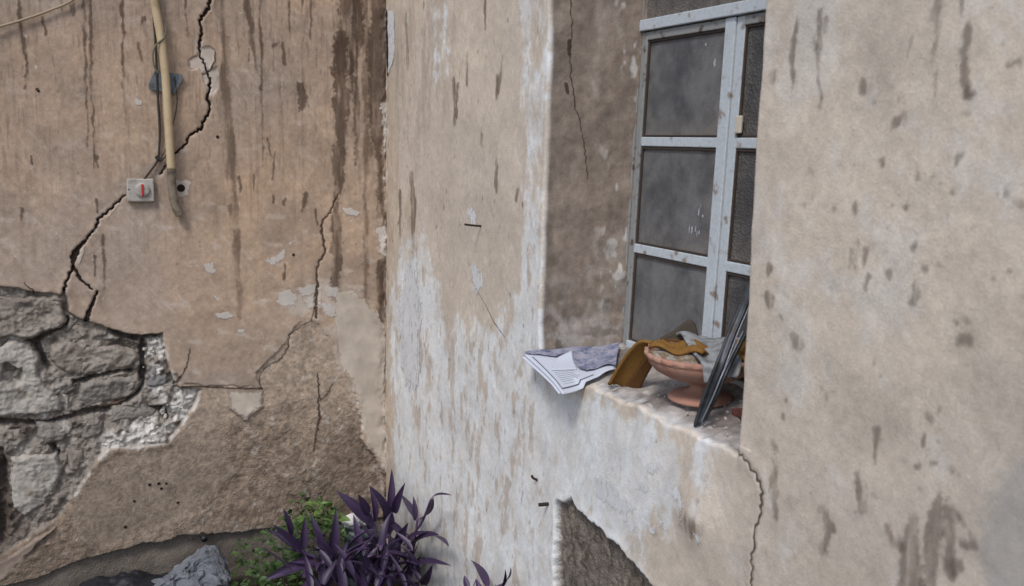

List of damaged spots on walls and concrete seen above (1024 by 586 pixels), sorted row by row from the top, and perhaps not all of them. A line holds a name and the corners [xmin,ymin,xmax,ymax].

water stain [73,0,94,124]
crack [159,0,220,174]
water stain [330,0,387,207]
crack [564,0,588,176]
crack [63,195,126,322]
crack [172,194,338,390]
peeling [266,241,295,265]
water stain [330,219,342,288]
water stain [376,260,385,323]
flaking render [0,262,421,586]
crack [313,373,333,451]
crack [738,450,764,586]